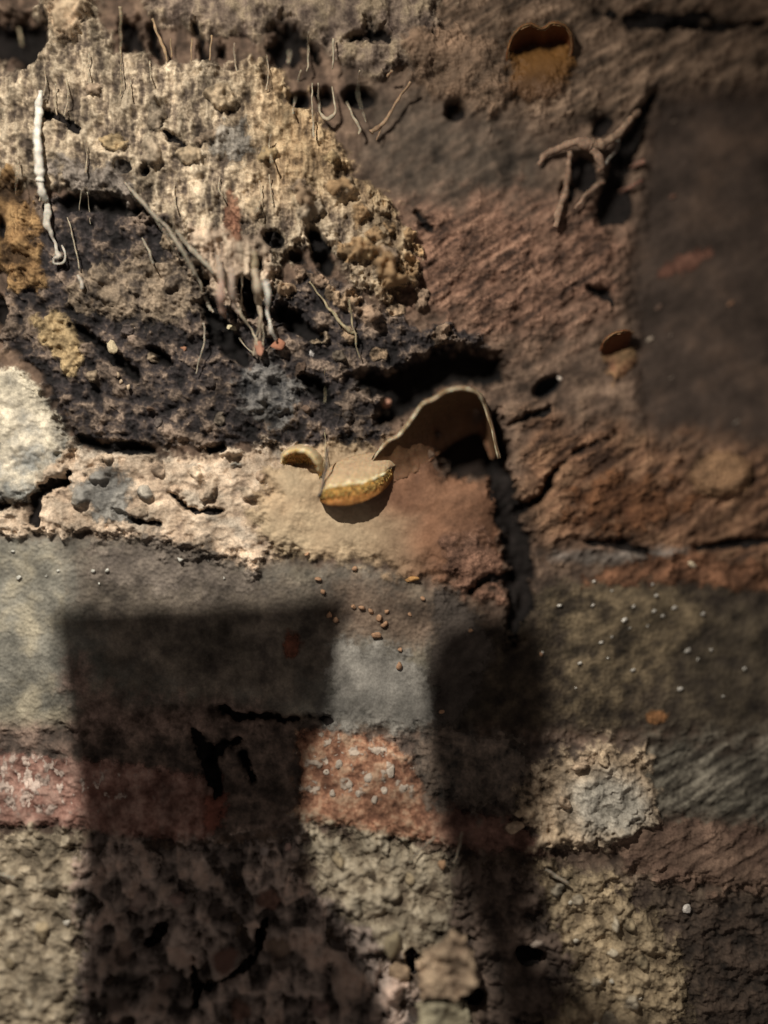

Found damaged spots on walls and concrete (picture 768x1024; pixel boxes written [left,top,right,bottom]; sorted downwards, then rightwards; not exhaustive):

spalling [0,0,504,572]
crack [468,405,617,647]